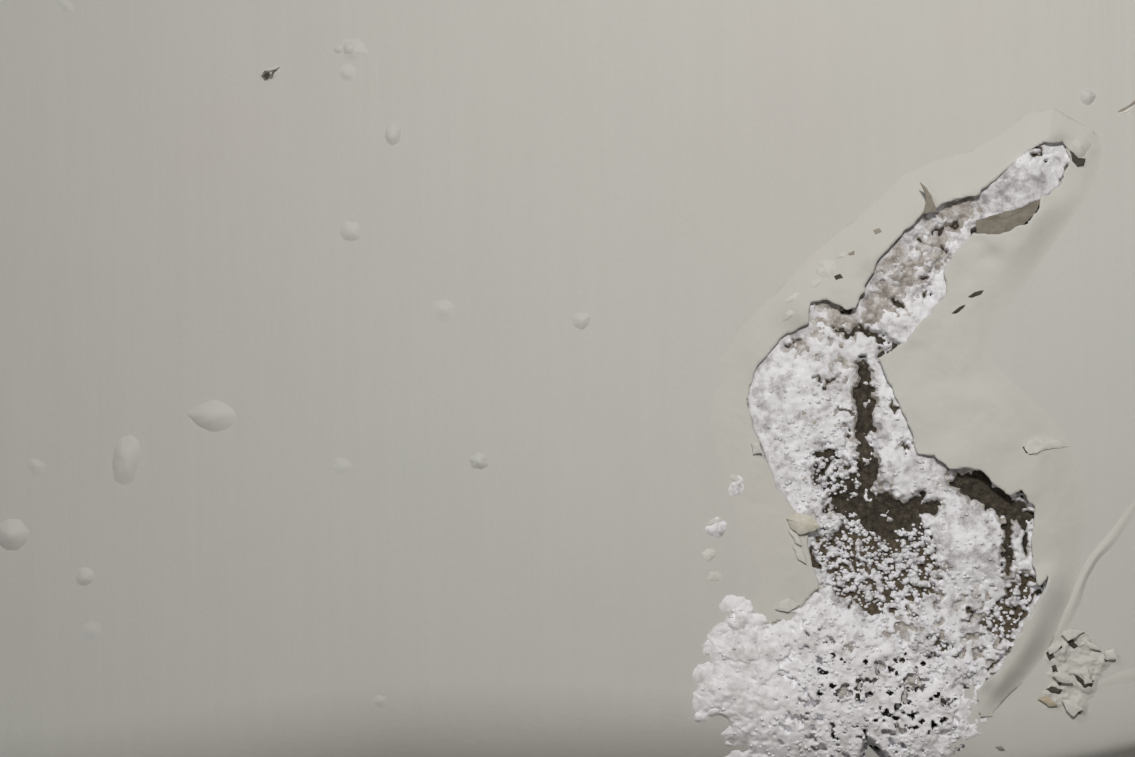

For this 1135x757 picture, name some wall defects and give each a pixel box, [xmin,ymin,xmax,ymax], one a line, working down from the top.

spalling [747,142,1070,757]
water stain [692,592,980,757]
peeling [1039,628,1116,716]